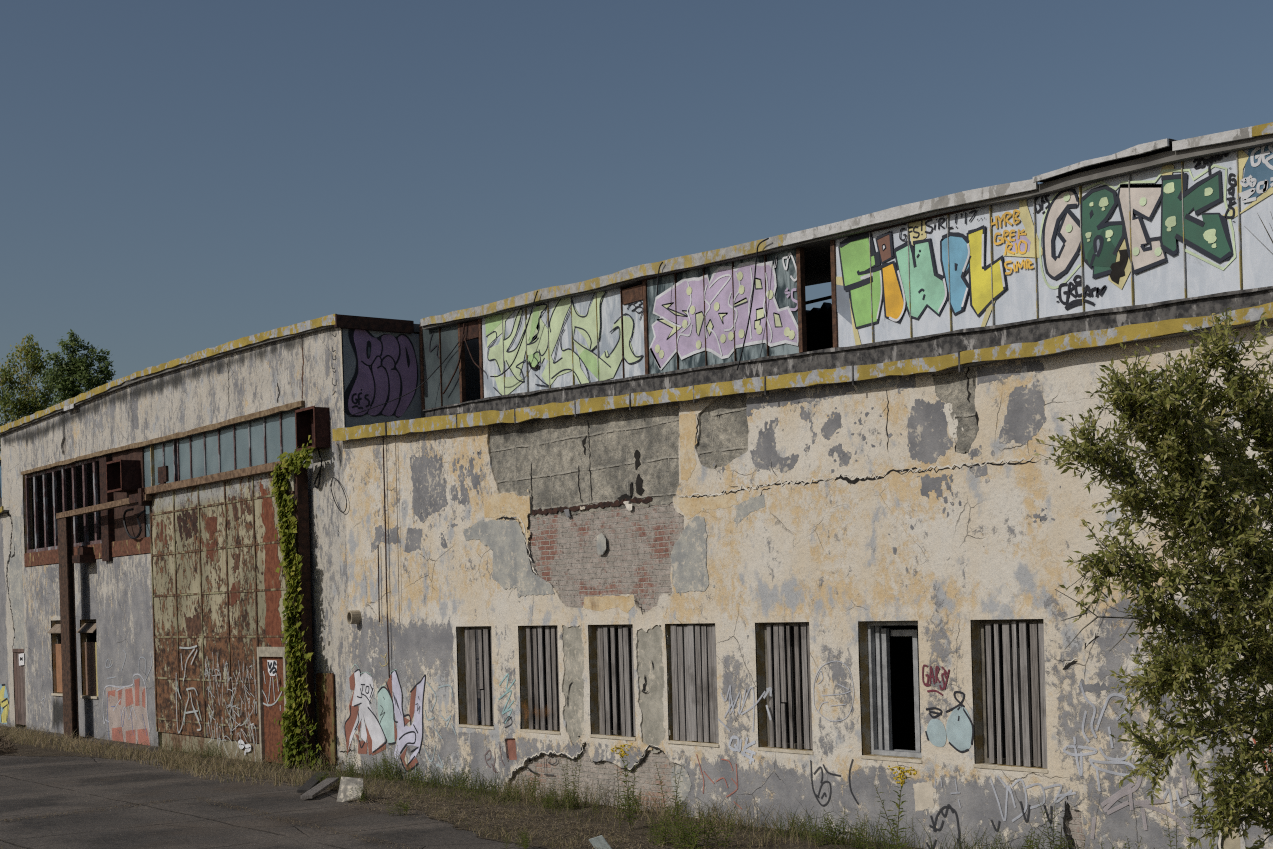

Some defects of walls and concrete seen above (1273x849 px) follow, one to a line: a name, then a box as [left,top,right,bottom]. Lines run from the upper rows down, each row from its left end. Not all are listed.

spalling [371,382,882,613]
crack [680,367,1040,498]
peeling [880,374,964,517]
peeling [968,360,1046,483]
crack [485,736,662,789]
spalling [507,625,692,813]
peeling [913,781,936,815]